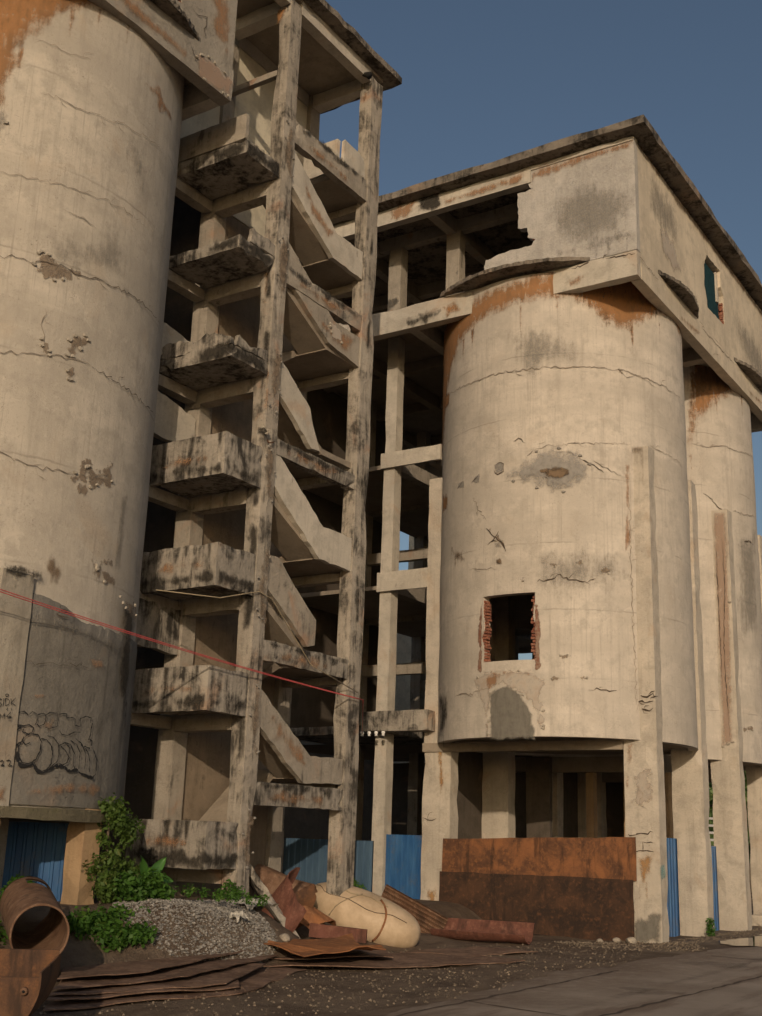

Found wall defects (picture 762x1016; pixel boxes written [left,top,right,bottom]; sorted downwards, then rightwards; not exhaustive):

crack [2,171,145,228]
spalling [32,249,81,282]
crack [2,254,160,323]
crack [0,308,151,411]
spalling [65,333,91,381]
crack [447,366,679,398]
spalling [70,459,114,494]
crack [537,573,596,584]
crack [594,497,658,712]
damp [490,687,534,739]